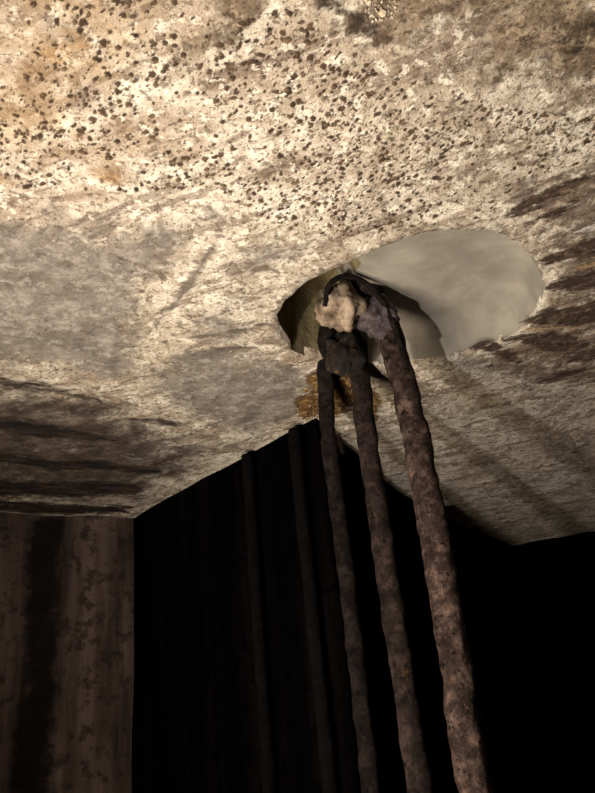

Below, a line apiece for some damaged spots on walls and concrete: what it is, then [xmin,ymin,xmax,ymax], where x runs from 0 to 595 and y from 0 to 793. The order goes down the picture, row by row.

water stain [0,0,595,384]
peeling [502,175,589,226]
spalling [276,229,595,384]
water stain [0,378,100,402]
water stain [152,318,309,428]
rust [294,369,319,419]
water stain [0,417,113,441]
water stain [129,418,180,426]